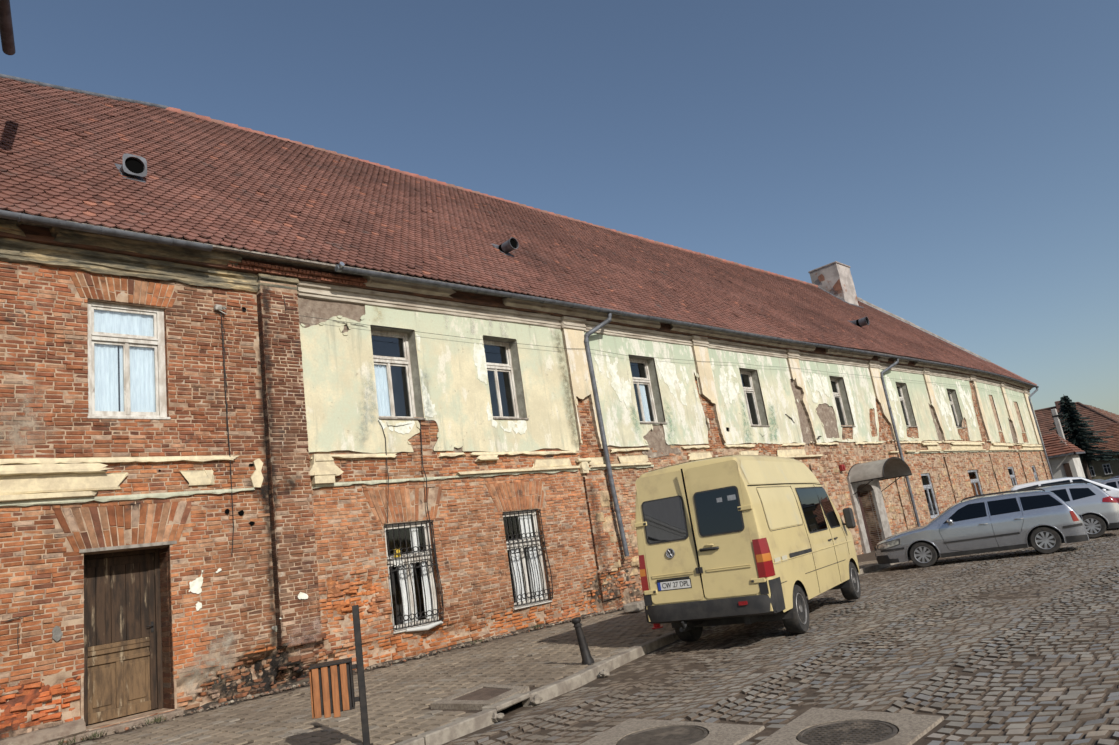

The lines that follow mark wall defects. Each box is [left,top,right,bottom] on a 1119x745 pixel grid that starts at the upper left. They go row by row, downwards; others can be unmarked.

flaking render [297,294,365,335]
flaking render [377,369,440,472]
flaking render [575,395,602,458]
flaking render [642,424,682,458]
peeling [656,358,759,451]
flaking render [790,367,918,444]
leakage [185,639,311,702]
spalling [0,676,80,731]